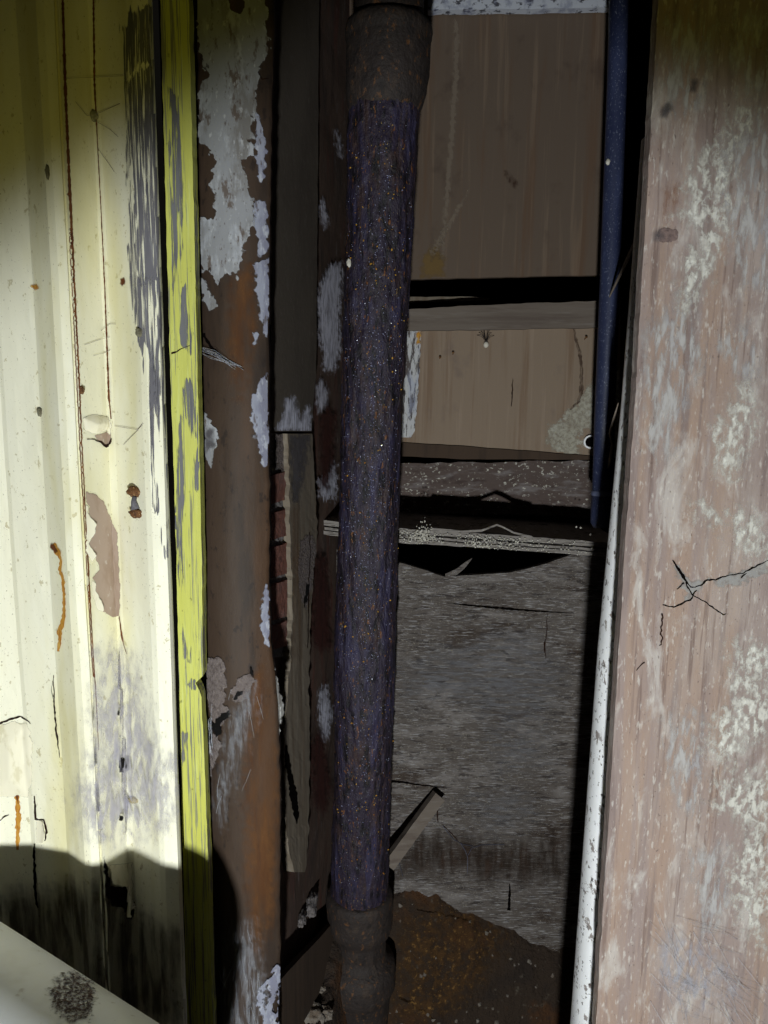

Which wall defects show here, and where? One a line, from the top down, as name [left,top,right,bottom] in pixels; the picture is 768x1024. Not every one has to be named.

peeling [196,0,271,345]
efflorescence [644,6,768,453]
peeling [250,376,284,472]
corrosion [50,543,66,652]
peeling [86,492,120,617]
crack [636,560,768,671]
spalling [187,657,256,777]
corrosion [14,795,22,850]
peeling [256,965,280,1024]